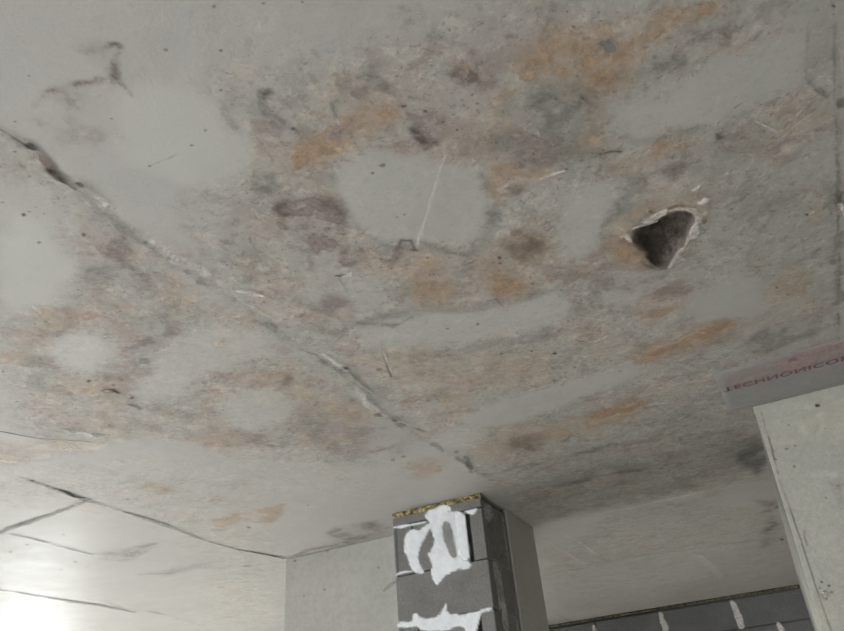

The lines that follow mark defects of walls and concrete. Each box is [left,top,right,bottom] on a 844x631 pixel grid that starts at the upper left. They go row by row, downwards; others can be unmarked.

crack [11,136,84,190]
crack [110,217,206,285]
water stain [271,197,356,267]
spalling [619,199,709,271]
crack [317,358,477,472]
crack [0,480,283,559]
crack [0,590,132,612]